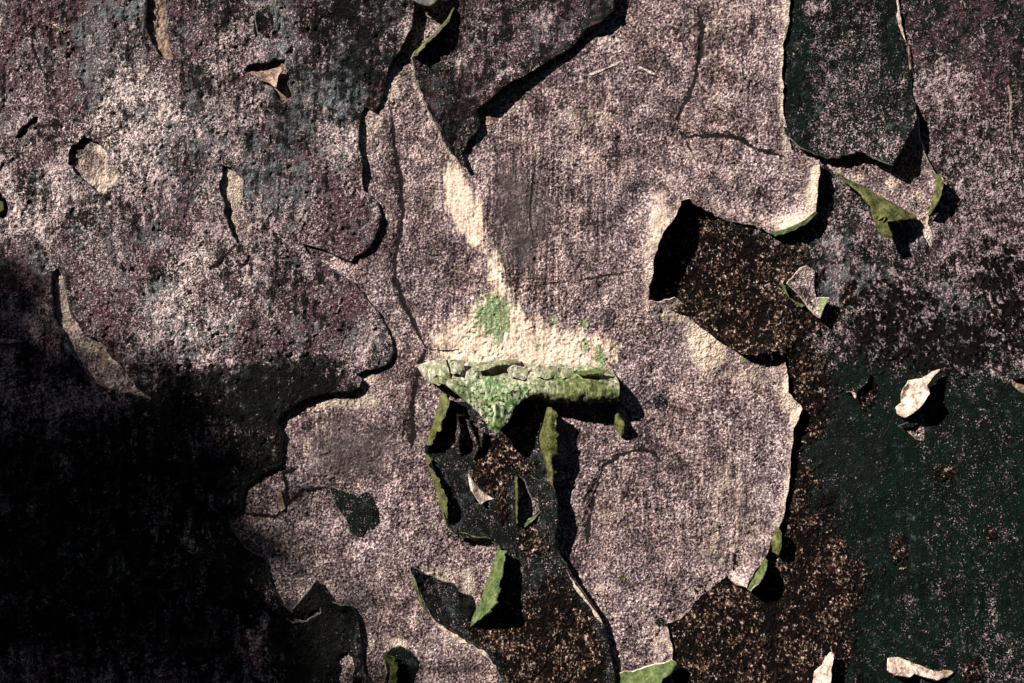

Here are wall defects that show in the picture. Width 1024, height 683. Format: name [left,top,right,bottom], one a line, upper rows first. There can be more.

peeling [0,0,416,683]
flaking render [230,0,944,683]
crack [676,4,786,157]
spalling [1007,370,1024,393]